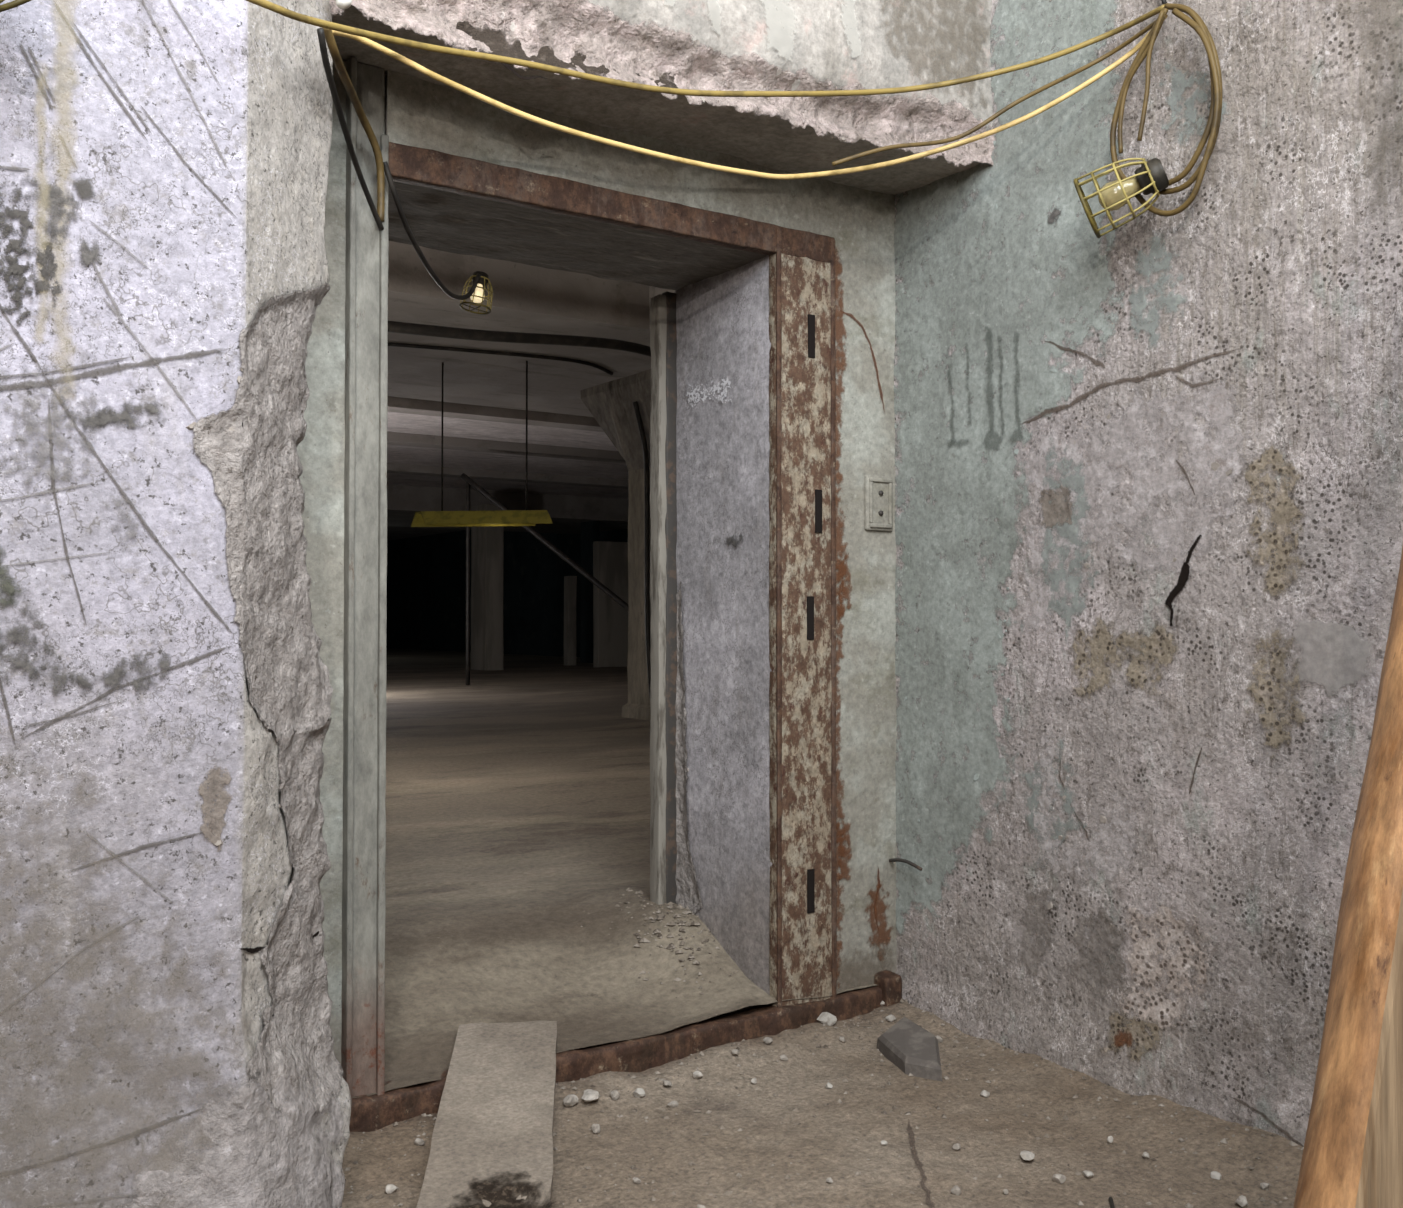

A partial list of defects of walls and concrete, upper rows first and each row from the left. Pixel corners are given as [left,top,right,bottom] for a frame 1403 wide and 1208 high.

water stain [3,226,57,323]
crack [1022,341,1234,424]
peeling [330,0,1306,934]
crack [1176,461,1195,495]
crack [1165,535,1202,626]
crack [240,945,266,953]
spalling [1070,900,1213,1062]